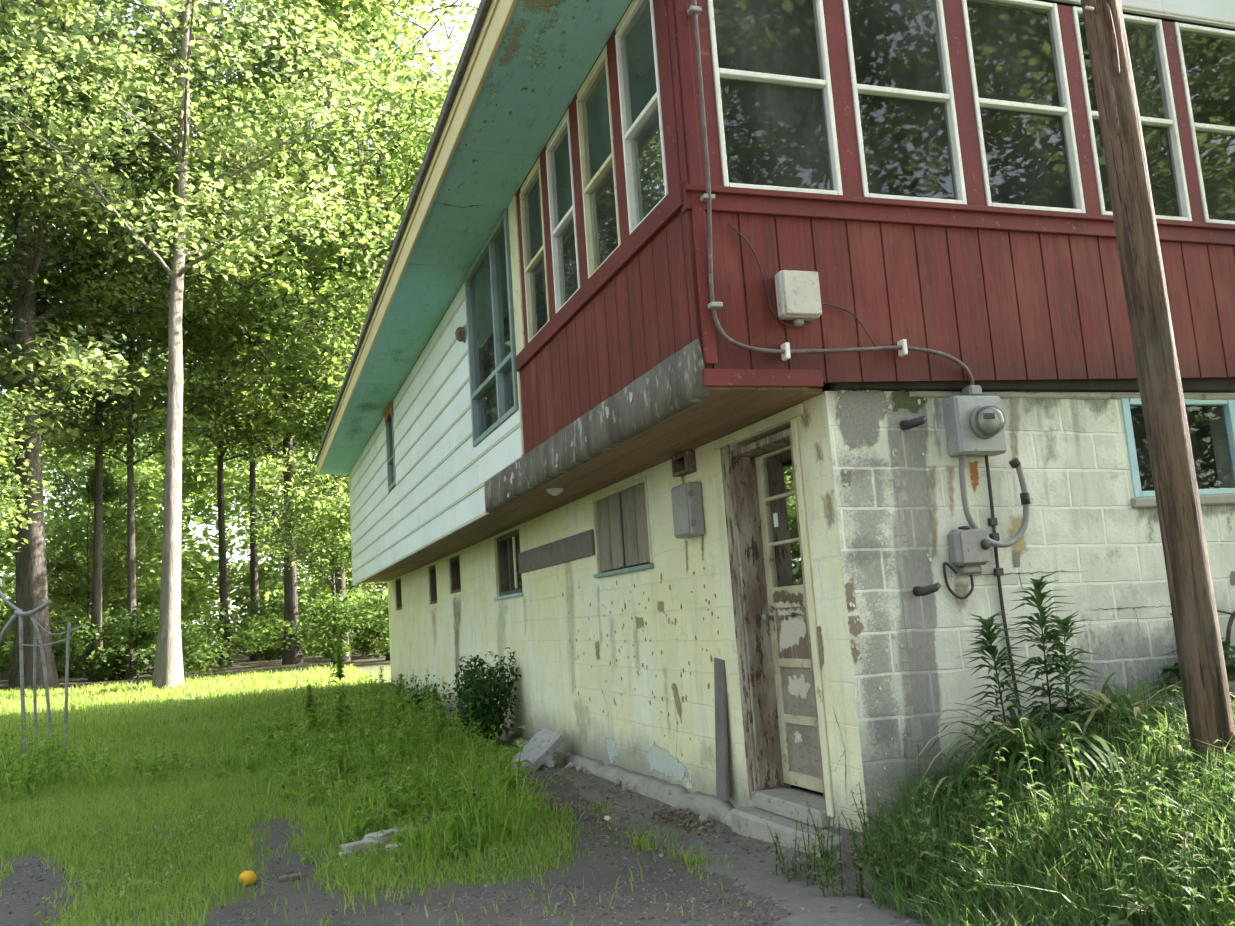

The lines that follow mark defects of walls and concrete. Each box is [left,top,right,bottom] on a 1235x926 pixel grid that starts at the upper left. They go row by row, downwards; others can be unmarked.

corrosion [969,461,979,492]
peeling [836,390,942,799]
peeling [569,573,682,690]
peeling [649,662,691,724]
peeling [647,734,694,790]